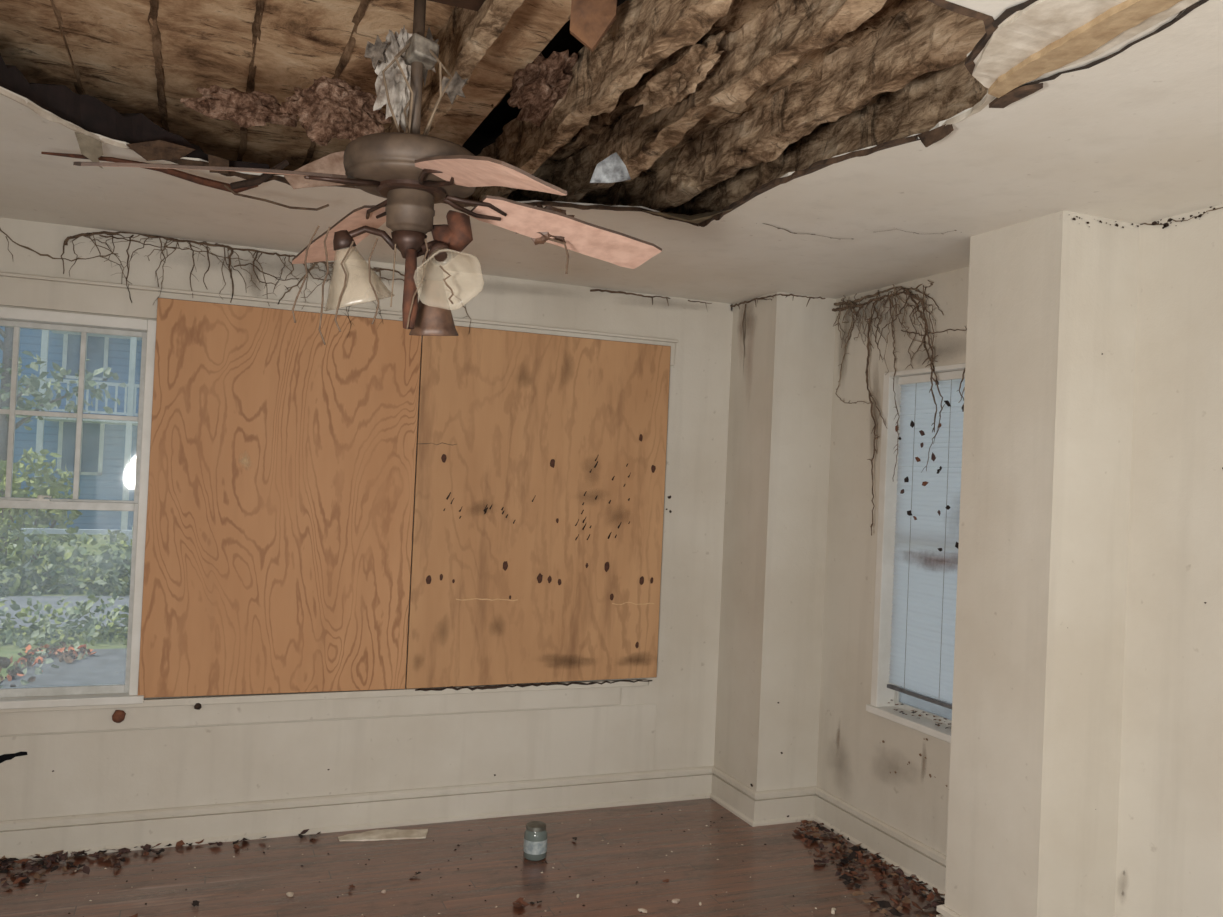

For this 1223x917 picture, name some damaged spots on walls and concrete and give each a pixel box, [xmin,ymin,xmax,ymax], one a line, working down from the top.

peeling [972,0,1199,108]